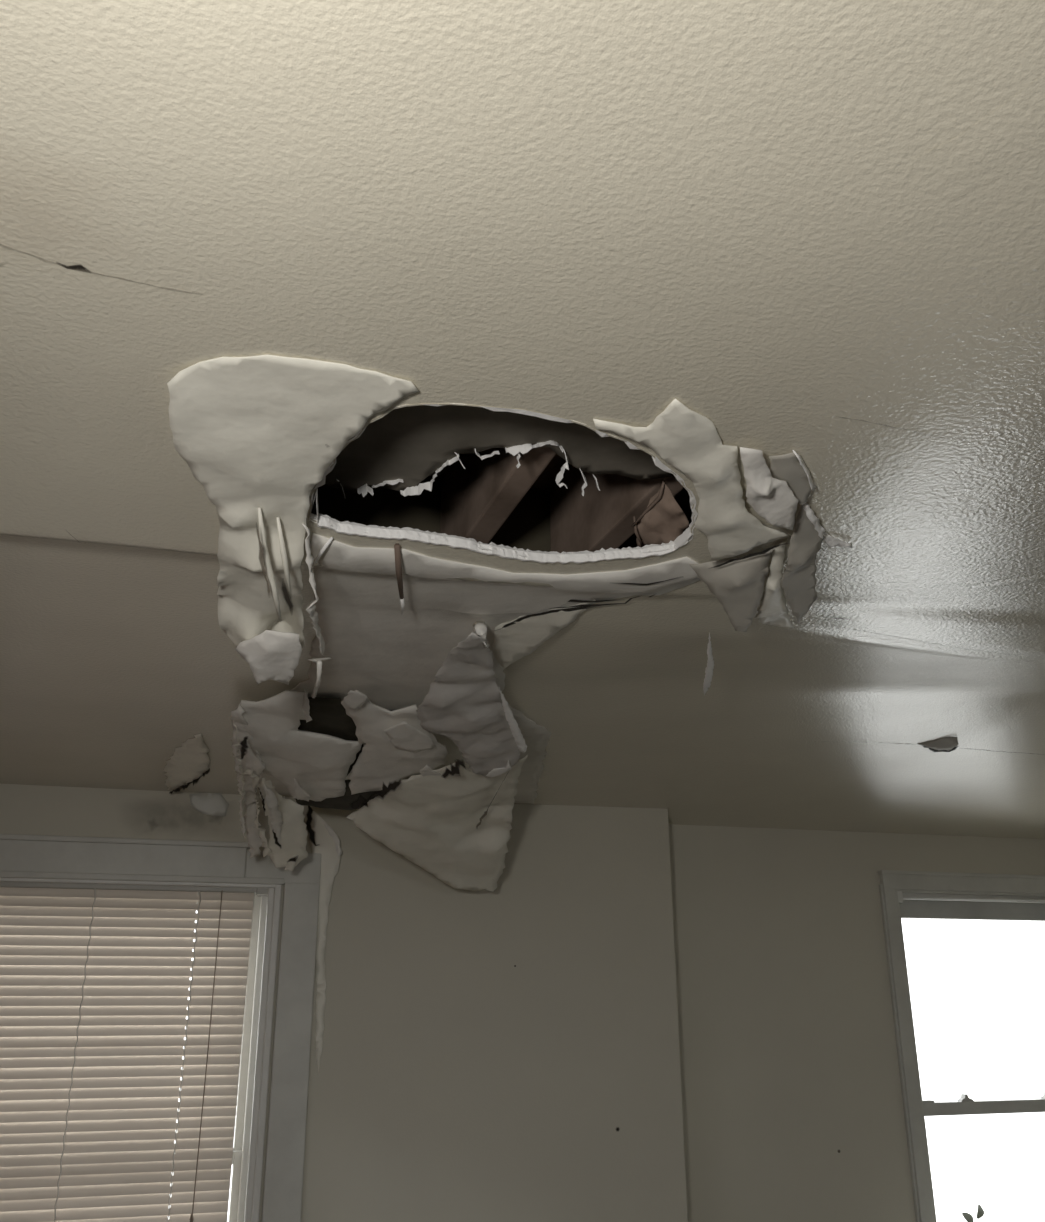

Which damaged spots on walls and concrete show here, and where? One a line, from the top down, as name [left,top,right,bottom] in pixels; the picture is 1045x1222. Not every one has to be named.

crack [61,264,88,272]
peeling [163,354,853,1073]